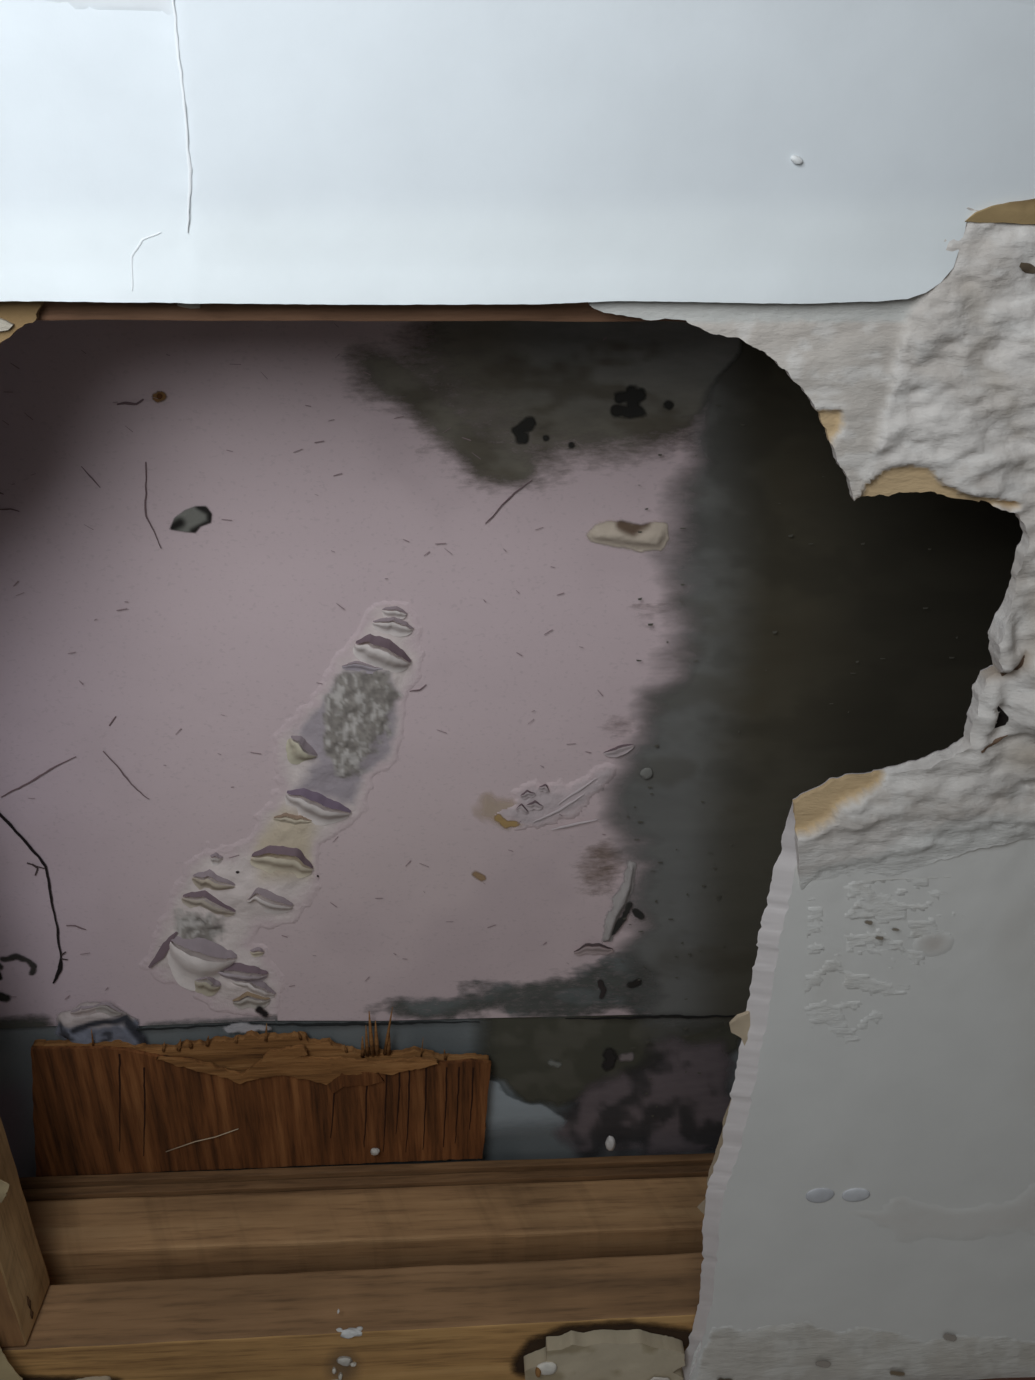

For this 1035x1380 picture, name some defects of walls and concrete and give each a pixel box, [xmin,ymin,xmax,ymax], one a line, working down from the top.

flaking render [0,318,14,331]
flaking render [588,207,1035,890]
crack [0,716,149,984]
peeling [574,860,644,956]
leakage [349,321,1023,1158]